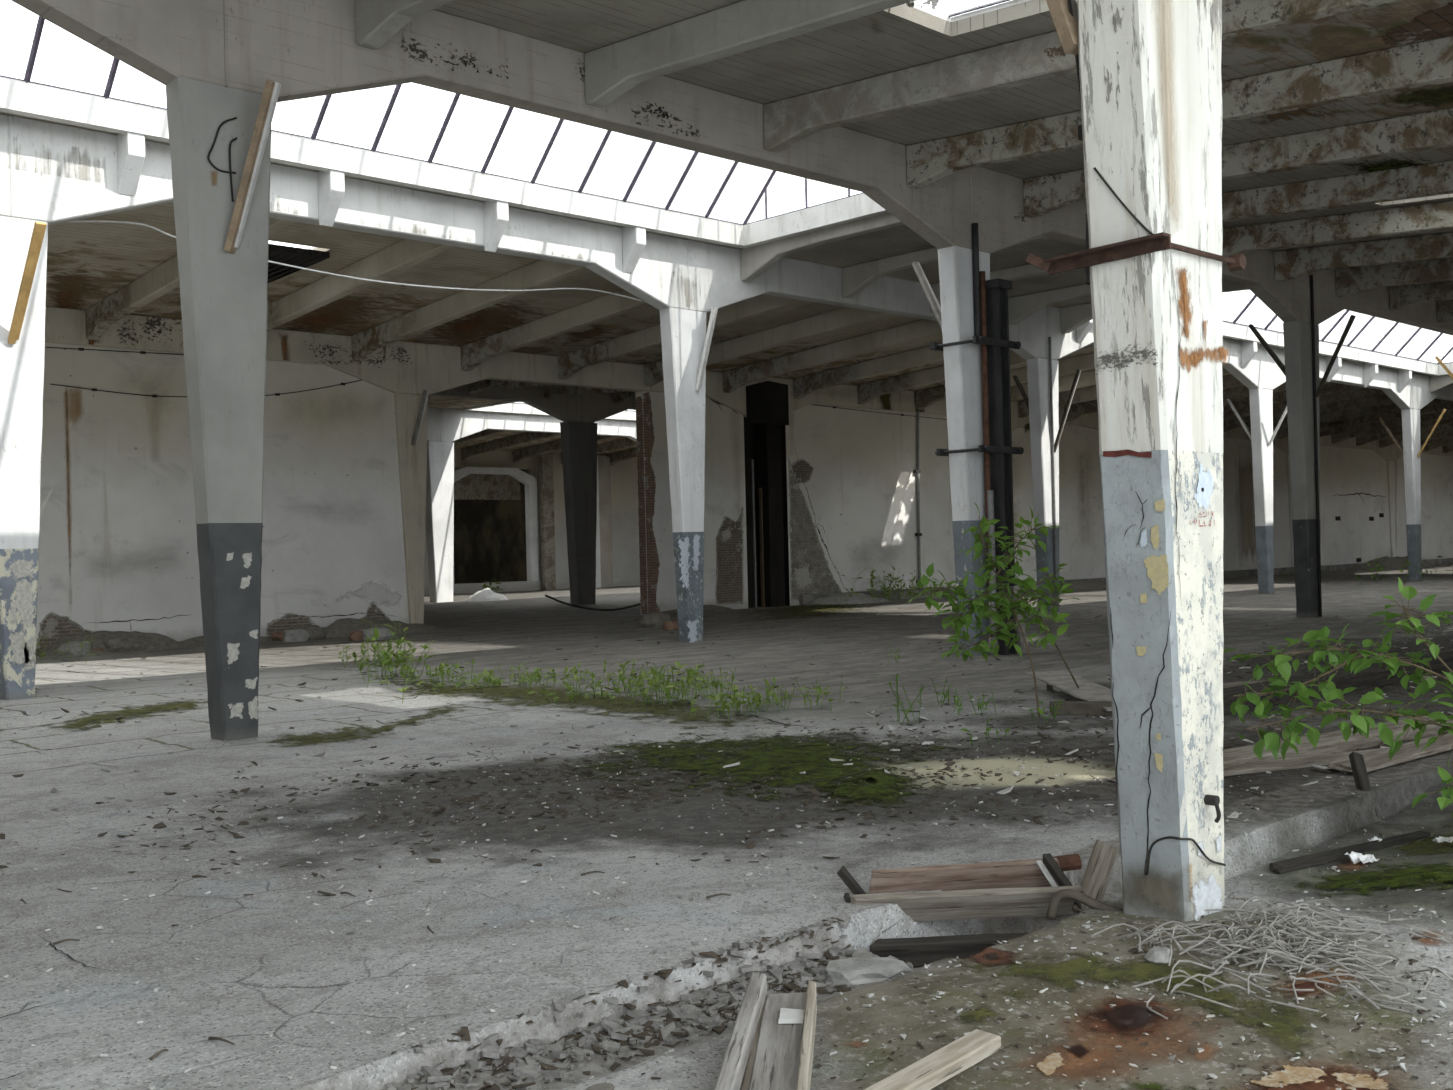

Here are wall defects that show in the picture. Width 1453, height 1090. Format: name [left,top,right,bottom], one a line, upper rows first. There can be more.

water stain [1260,103,1334,124]
corrosion [1178,268,1229,371]
peeling [226,552,252,589]
flaking render [360,601,391,621]
flaking render [636,392,660,614]
peeling [687,619,699,643]
flaking render [678,507,744,605]
flaking render [787,458,842,602]
crack [811,252,1187,889]
peeling [228,677,259,719]